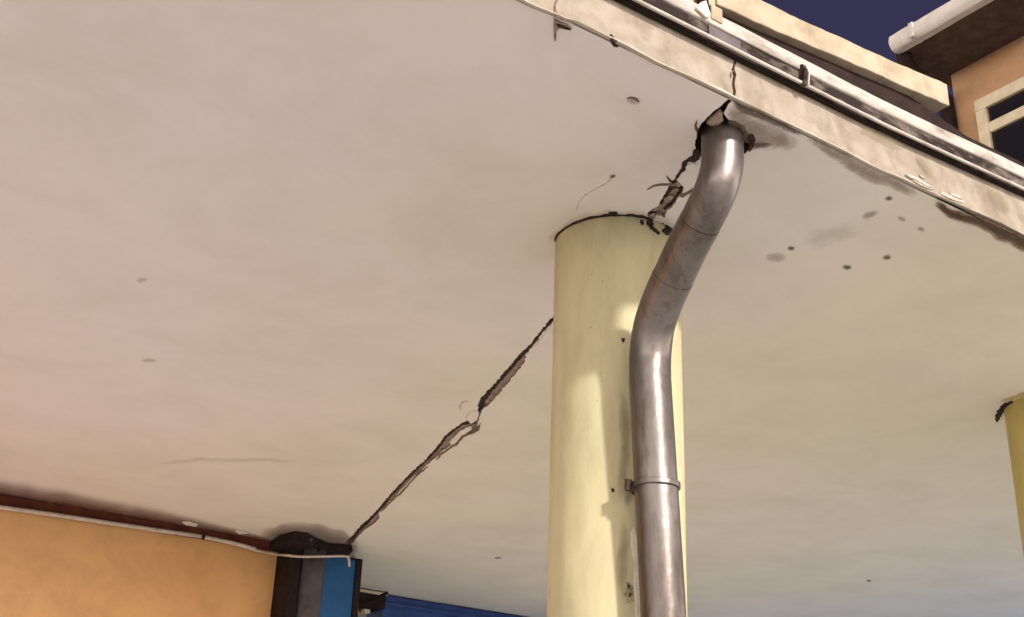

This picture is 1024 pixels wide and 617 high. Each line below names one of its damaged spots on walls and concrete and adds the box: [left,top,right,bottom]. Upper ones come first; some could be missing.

spalling [554,18,572,41]
crack [729,60,737,96]
crack [691,121,699,161]
crack [747,134,756,152]
damp [731,99,798,149]
damp [815,141,908,200]
crack [347,316,554,545]